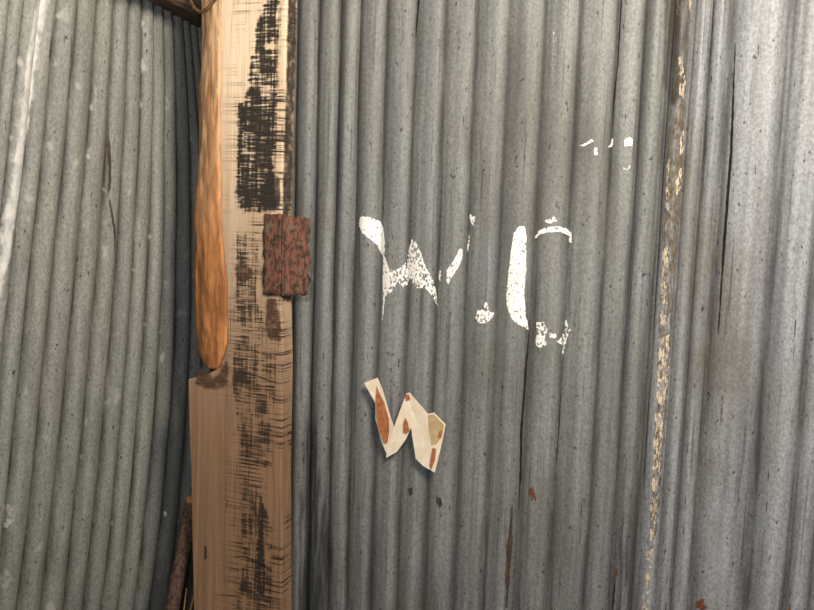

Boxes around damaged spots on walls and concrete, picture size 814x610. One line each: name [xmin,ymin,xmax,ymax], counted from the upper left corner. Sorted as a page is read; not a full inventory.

peeling [387,240,441,305]
peeling [535,322,556,348]